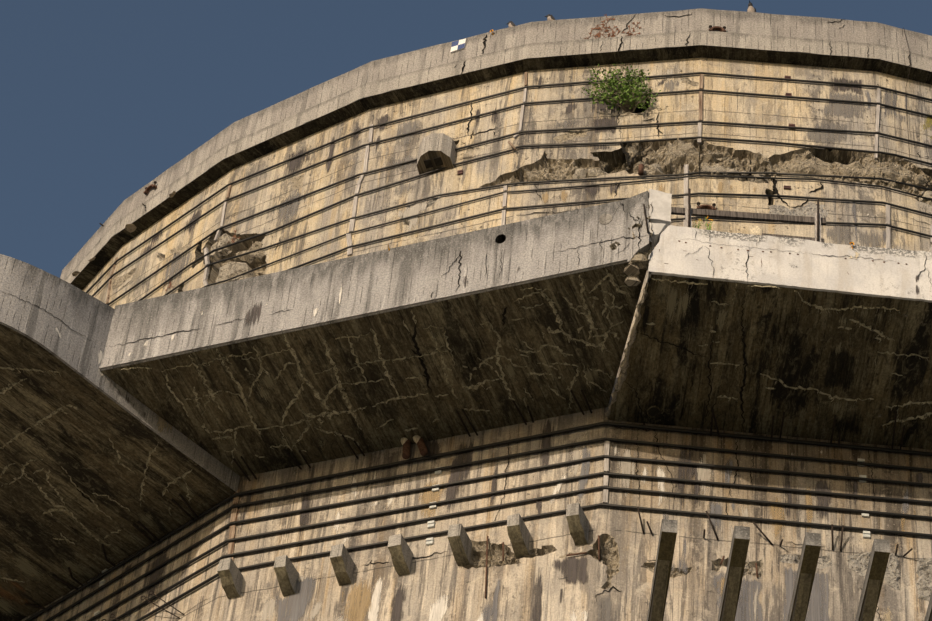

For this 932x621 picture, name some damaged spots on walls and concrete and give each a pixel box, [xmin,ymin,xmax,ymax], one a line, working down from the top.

leakage [807,77,871,143]
spalling [479,137,932,206]
crack [1,291,242,347]
crack [0,367,61,396]
crack [0,404,192,545]
spalling [460,534,620,589]
leakage [555,556,588,603]
spalling [670,567,692,578]
spalling [711,556,729,573]
spalling [743,559,764,580]